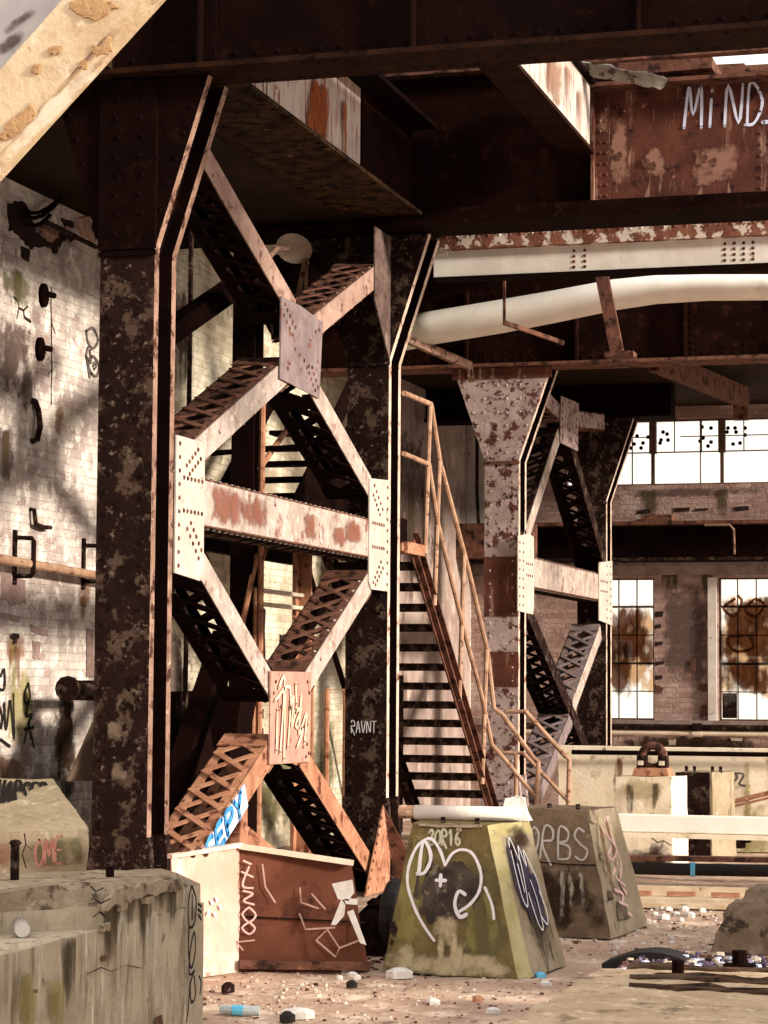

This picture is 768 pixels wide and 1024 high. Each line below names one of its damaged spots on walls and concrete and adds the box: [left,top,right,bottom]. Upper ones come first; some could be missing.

spalling [69,0,119,22]
spalling [30,46,61,74]
spalling [78,36,113,70]
spalling [0,102,38,141]
corrosion [307,79,329,139]
spalling [39,216,97,243]
corrosion [212,487,267,526]
corrosion [305,513,318,538]
corrosion [334,521,361,547]